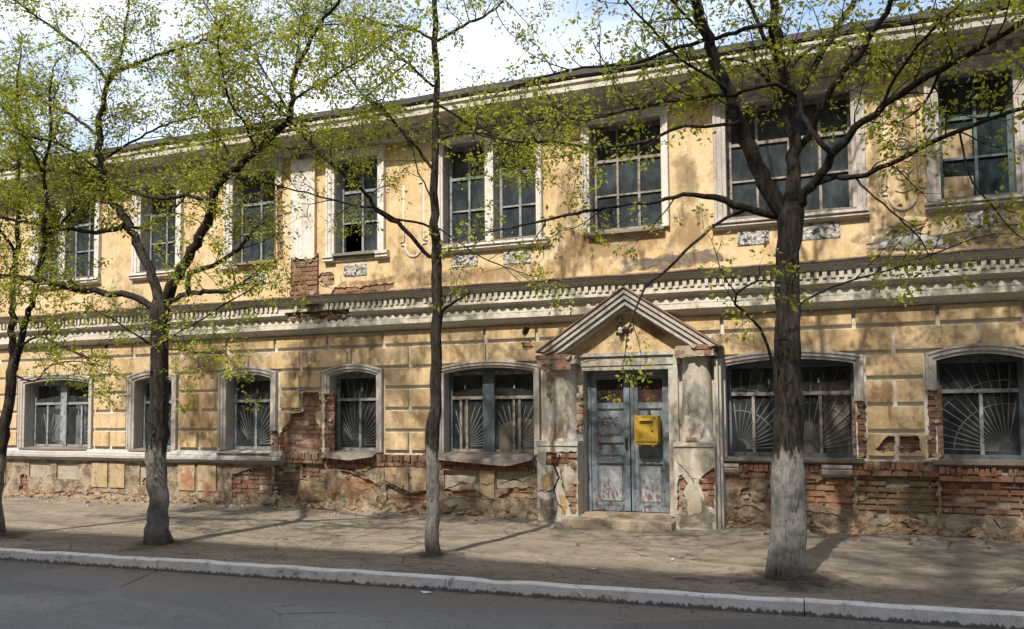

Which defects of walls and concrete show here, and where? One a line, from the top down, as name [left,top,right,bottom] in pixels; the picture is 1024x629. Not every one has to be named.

flaking render [274,186,395,297]
flaking render [523,327,572,399]
flaking render [232,387,336,498]
crack [337,454,565,517]
flaking render [741,484,771,504]
flaking render [805,386,1024,521]